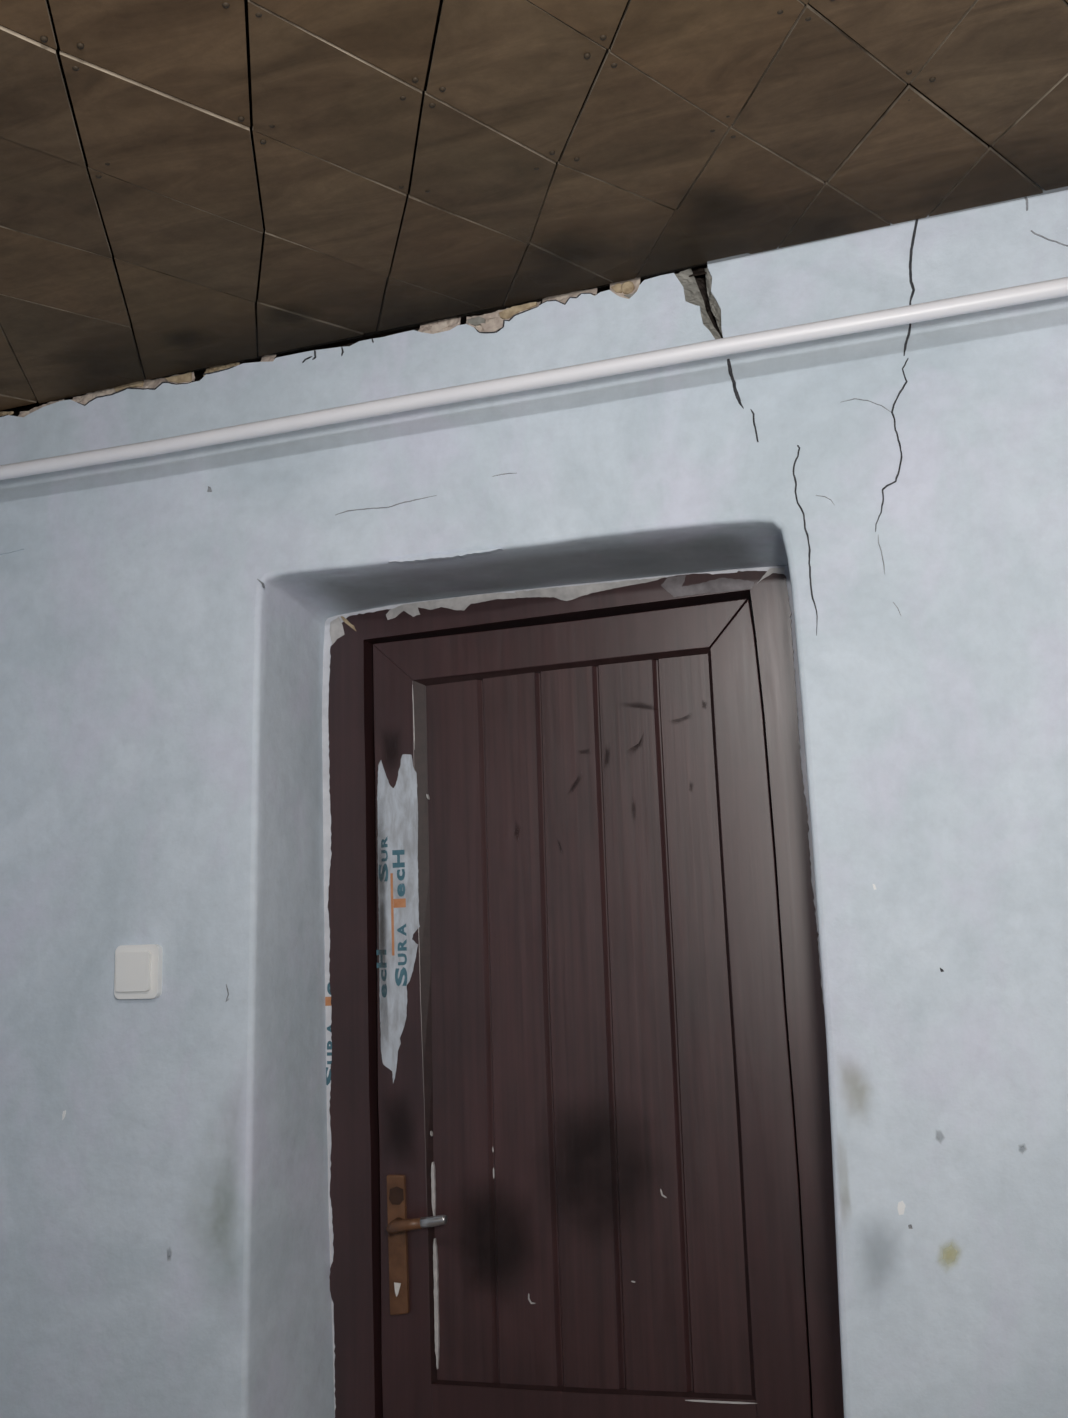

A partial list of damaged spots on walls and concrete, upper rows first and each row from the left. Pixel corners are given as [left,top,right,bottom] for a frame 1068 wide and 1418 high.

spalling [0,362,240,417]
crack [675,268,759,442]
crack [840,219,918,615]
crack [336,495,437,515]
crack [793,445,834,635]